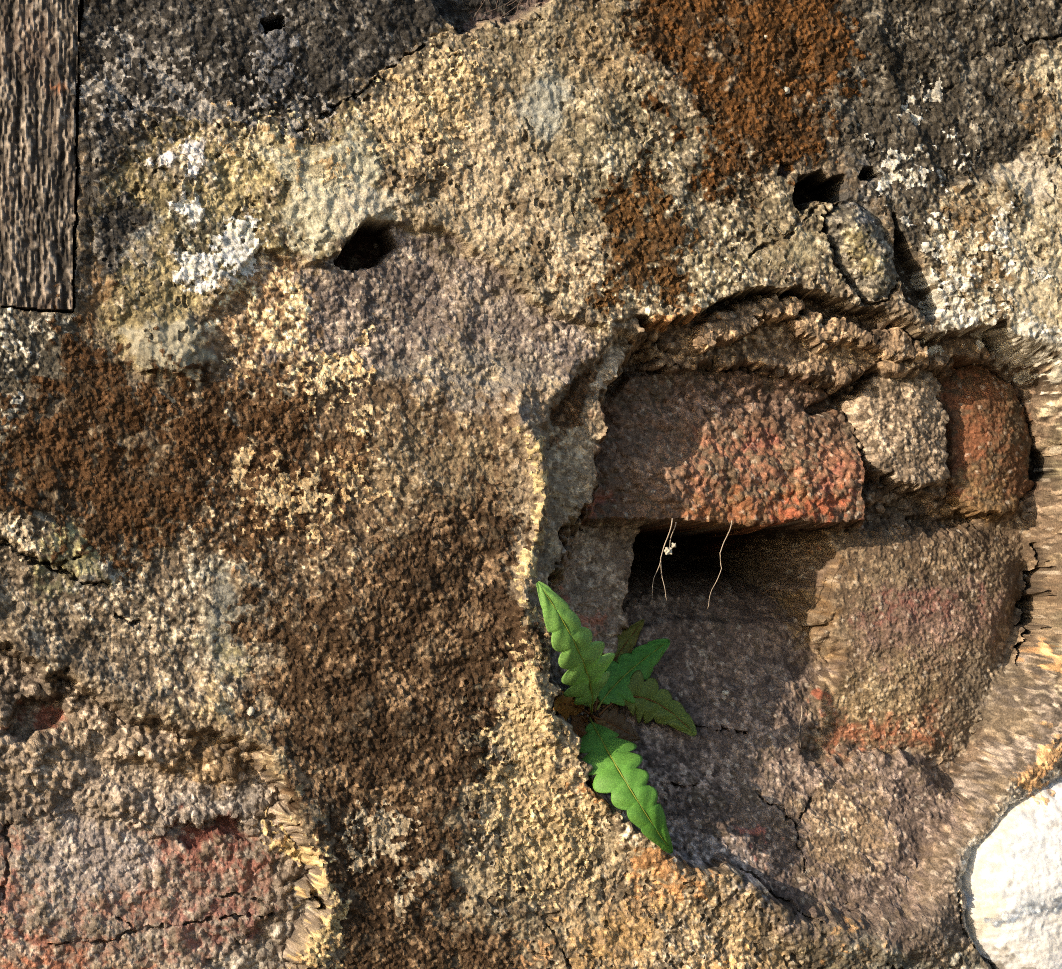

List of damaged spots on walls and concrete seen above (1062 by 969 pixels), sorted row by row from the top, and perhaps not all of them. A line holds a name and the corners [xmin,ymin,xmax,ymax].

water stain [59,0,525,303]
crack [748,201,934,324]
spalling [208,230,590,547]
spalling [601,289,1062,554]
crack [0,540,114,586]
crack [114,614,152,632]
spalling [464,426,1026,925]
crack [1013,543,1058,667]
crack [756,789,814,827]
crack [0,821,12,920]
crack [50,892,275,947]
crack [734,865,827,925]